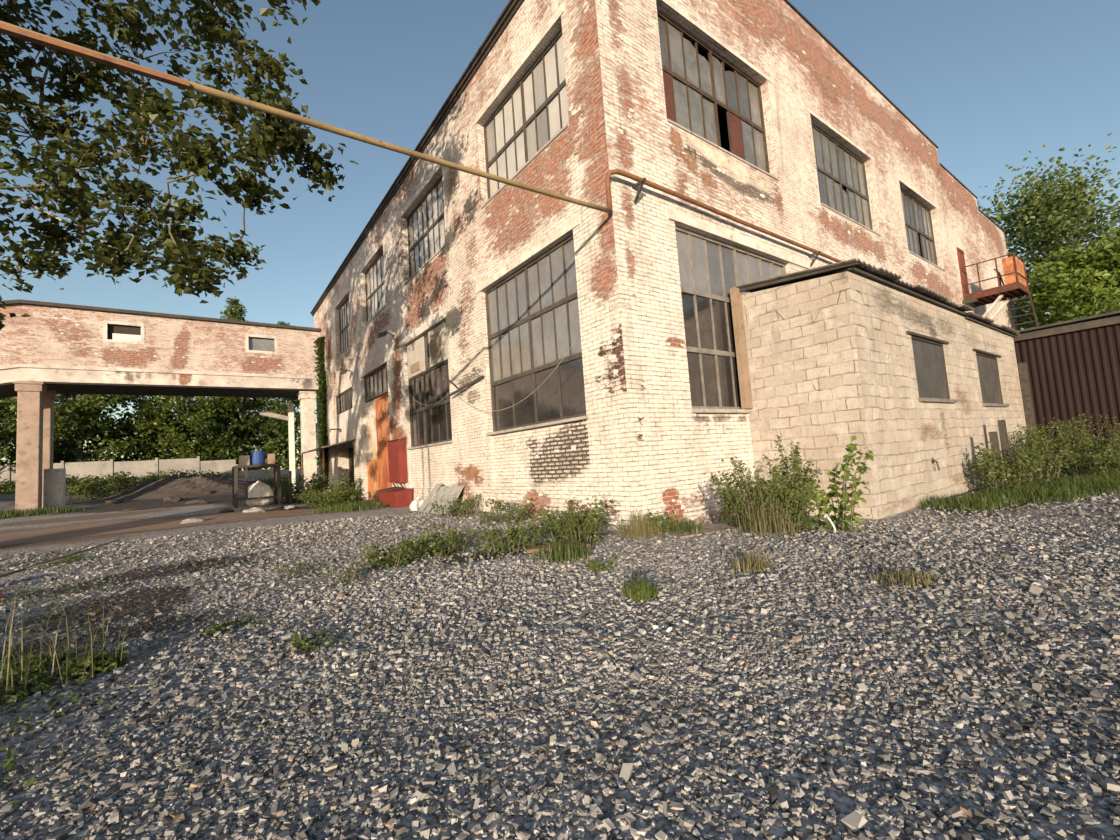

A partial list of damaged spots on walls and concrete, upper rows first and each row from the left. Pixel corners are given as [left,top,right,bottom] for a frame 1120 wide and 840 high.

peeling [351,0,635,356]
peeling [685,132,770,198]
peeling [730,0,1004,264]
peeling [909,259,953,301]
peeling [43,315,191,370]
peeling [241,355,282,372]
spalling [592,320,648,397]
spalling [516,421,626,525]
peeling [662,488,729,523]